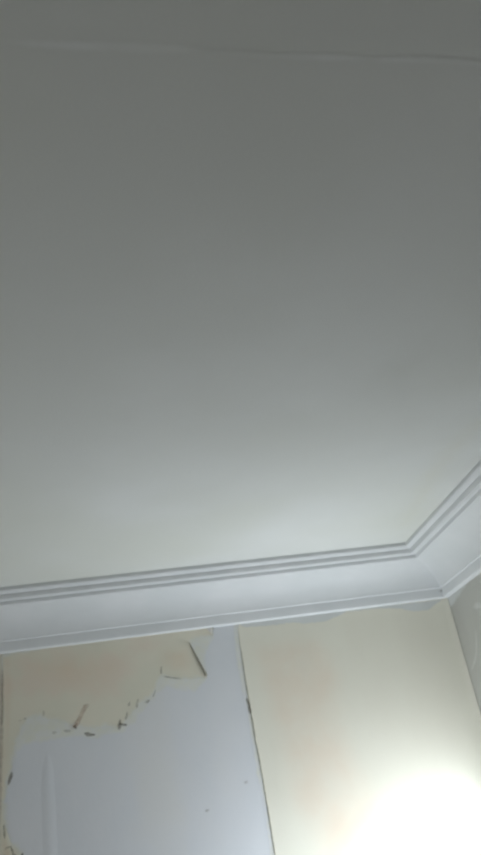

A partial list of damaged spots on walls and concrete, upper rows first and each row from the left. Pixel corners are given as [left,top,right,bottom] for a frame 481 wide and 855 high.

peeling [3,625,269,855]